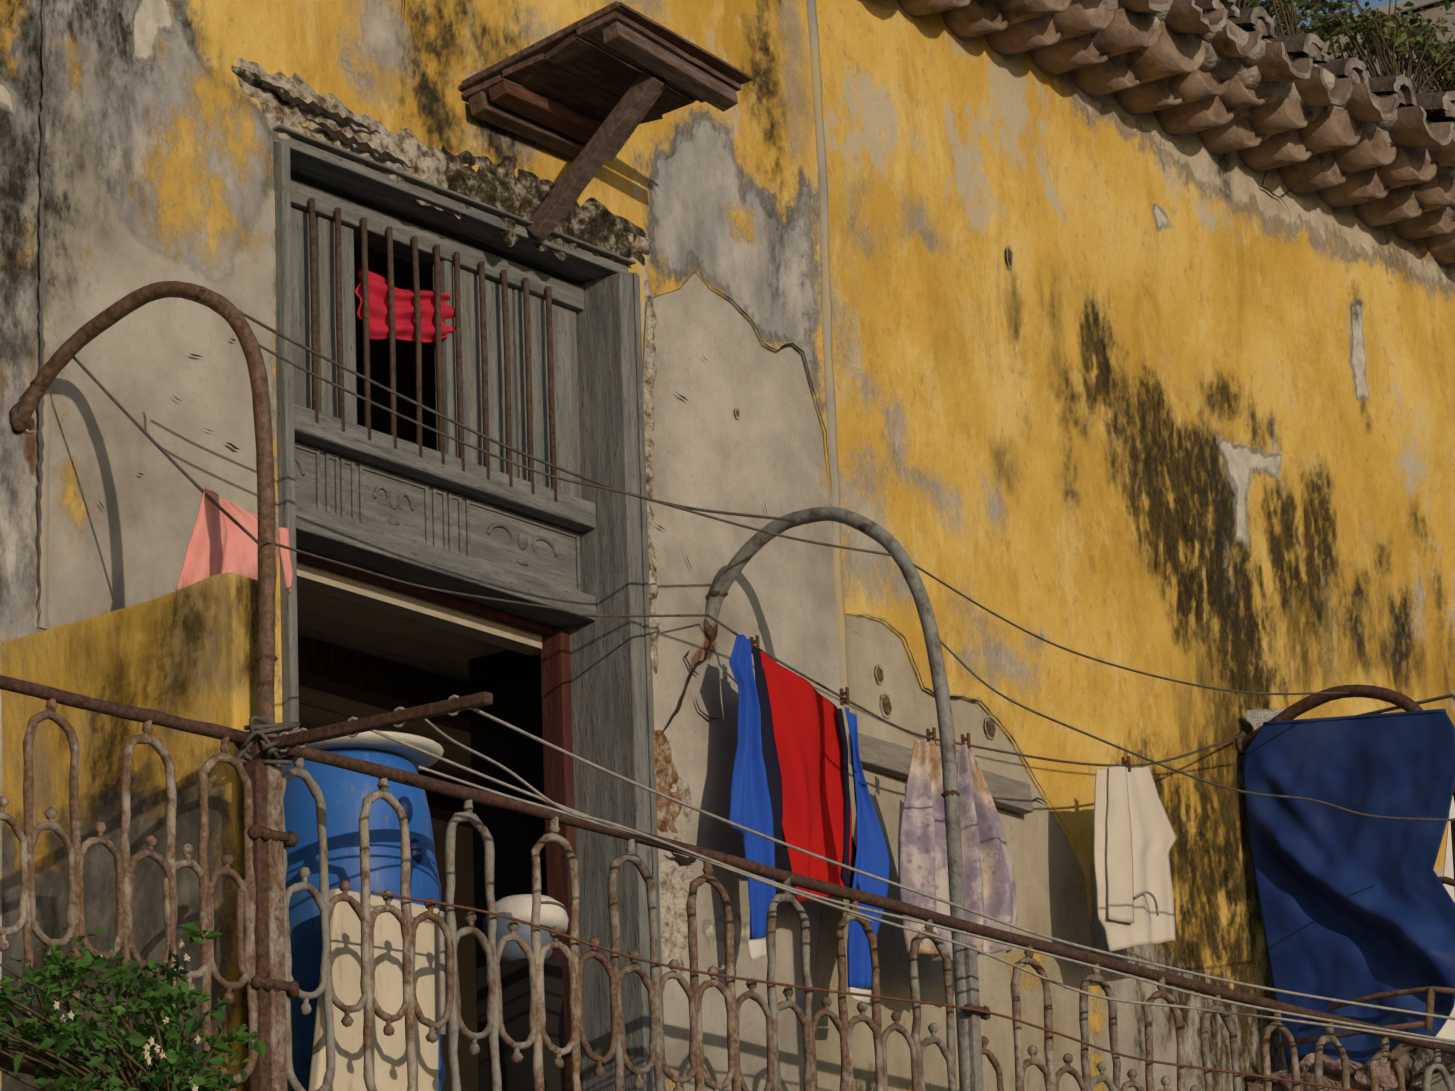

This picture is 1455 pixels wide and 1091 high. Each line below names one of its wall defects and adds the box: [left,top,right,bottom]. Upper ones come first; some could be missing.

water stain [0,39,60,304]
peeling [1059,71,1455,299]
water stain [87,587,207,815]
water stain [237,580,258,682]
peeling [0,0,836,796]
peeling [822,452,908,596]
water stain [1064,303,1337,1091]
peeling [1216,438,1282,547]
water stain [1345,579,1364,656]
water stain [1391,597,1411,683]
peeling [0,773,237,1091]
flaking render [653,730,696,975]